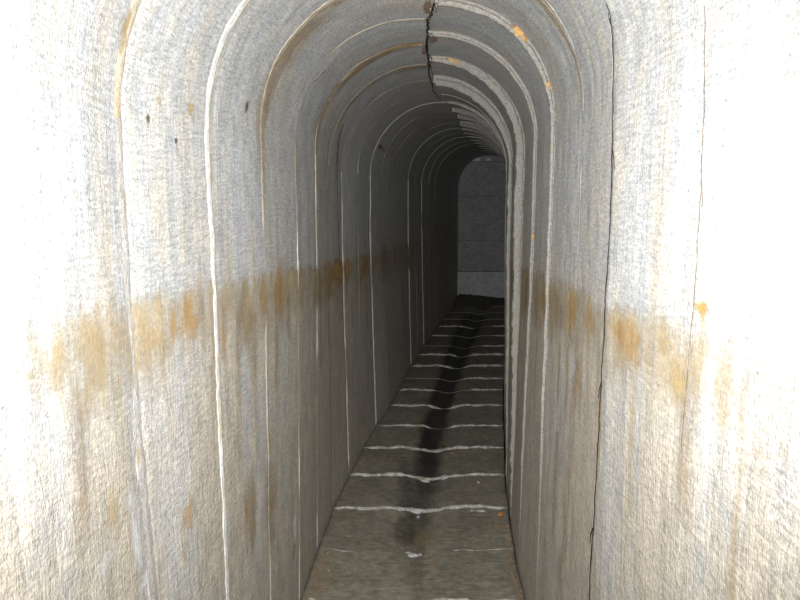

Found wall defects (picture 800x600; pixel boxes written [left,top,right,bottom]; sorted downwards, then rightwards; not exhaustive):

crack [424,3,441,100]
corrosion [510,23,528,42]
crack [589,4,615,600]
leakage [406,315,484,525]